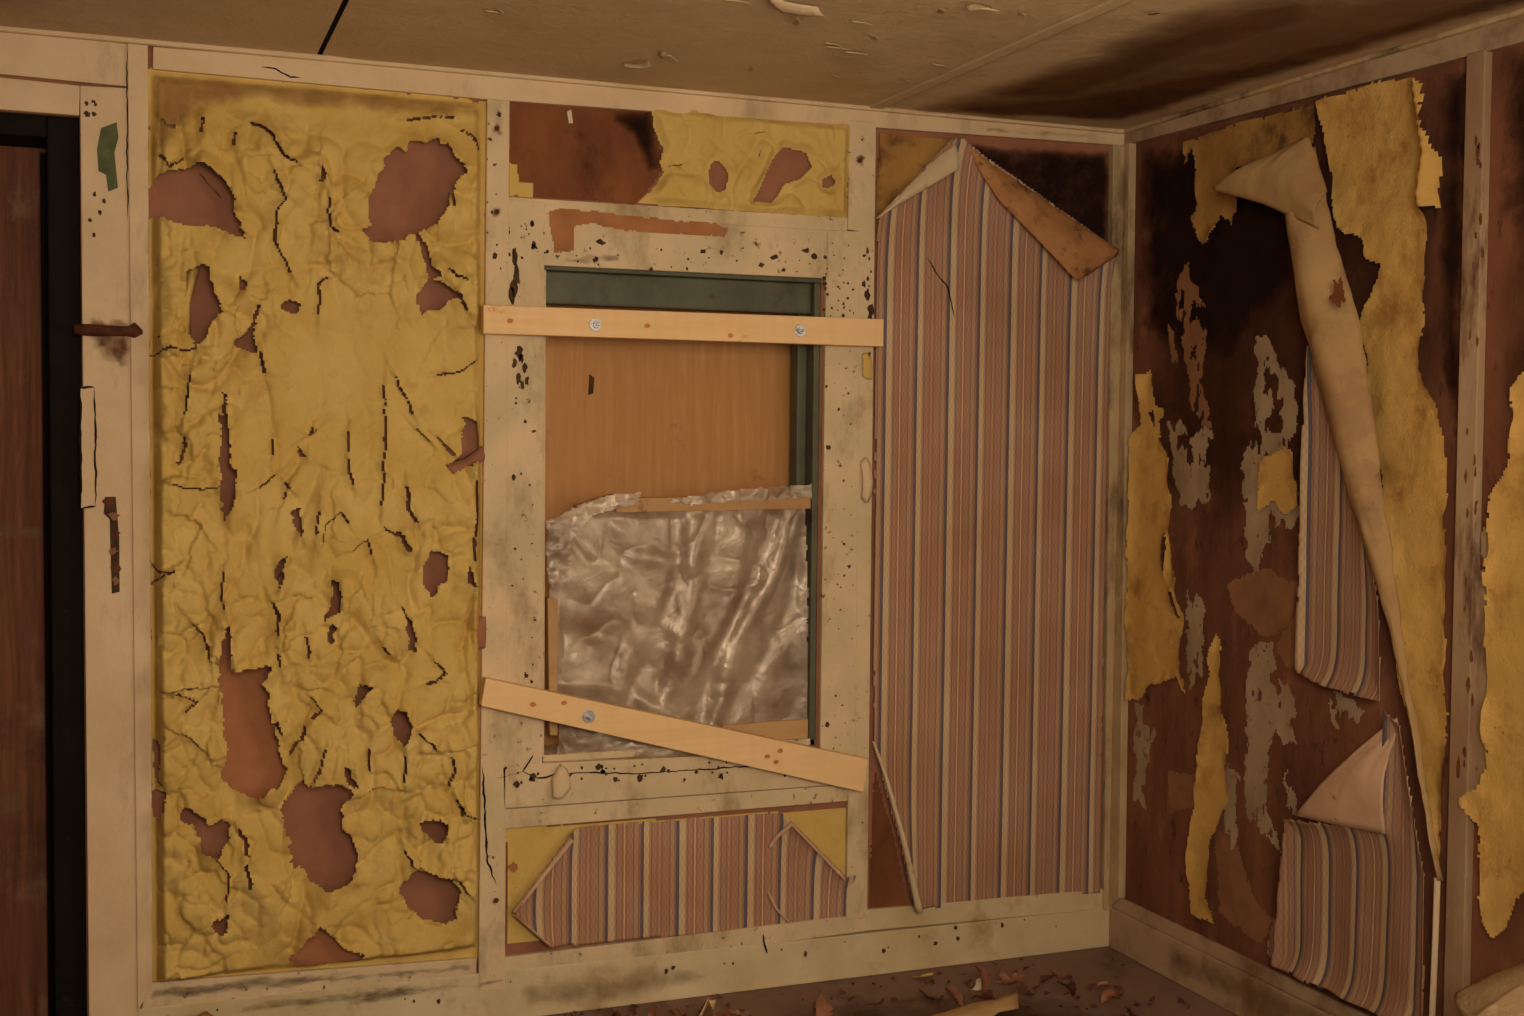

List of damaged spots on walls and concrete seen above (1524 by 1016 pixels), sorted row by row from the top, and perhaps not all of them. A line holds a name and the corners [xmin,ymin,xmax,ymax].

crack [123,52,131,214]
peeling [753,147,835,203]
spalling [758,243,874,319]
peeling [843,457,873,503]
peeling [148,67,738,982]
peeling [1227,568,1299,668]
spalling [1456,747,1467,779]